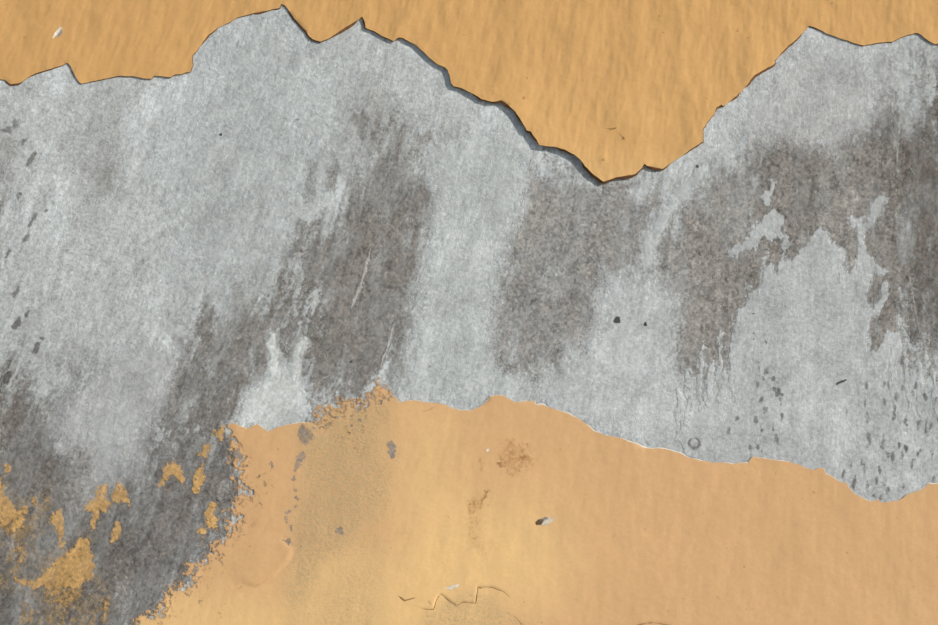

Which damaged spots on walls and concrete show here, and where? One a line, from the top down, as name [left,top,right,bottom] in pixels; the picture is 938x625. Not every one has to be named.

water stain [659,103,938,381]
water stain [490,155,662,387]
water stain [0,119,434,625]
peeling [428,385,485,410]
peeling [667,344,711,395]
peeling [0,477,28,541]
peeling [535,517,555,525]
crack [399,577,541,625]
crack [622,614,688,625]